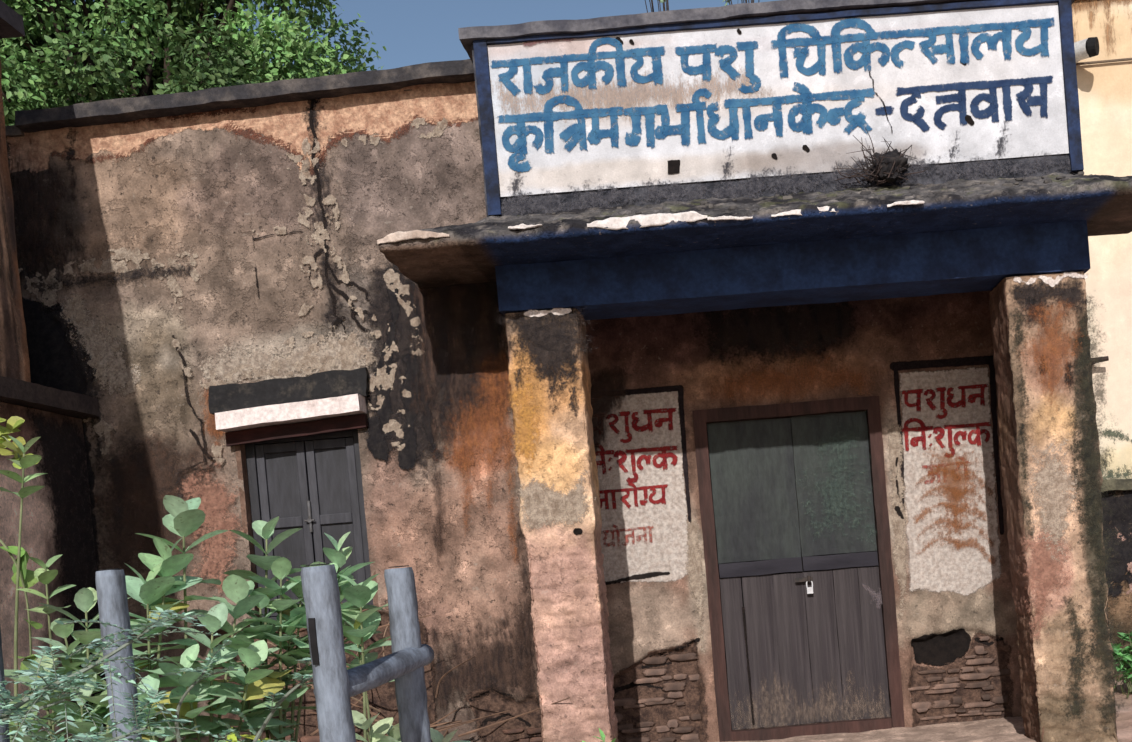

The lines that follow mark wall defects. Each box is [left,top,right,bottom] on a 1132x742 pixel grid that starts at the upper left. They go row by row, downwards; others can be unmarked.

damp [1072,0,1128,49]
crack [252,98,376,346]
spalling [377,230,450,244]
damp [0,155,214,707]
crack [172,335,225,477]
damp [199,261,626,555]
rust [914,448,997,564]
damp [428,522,538,719]
flaking render [613,519,709,742]
flaking render [908,628,1014,727]
damp [1063,596,1088,721]